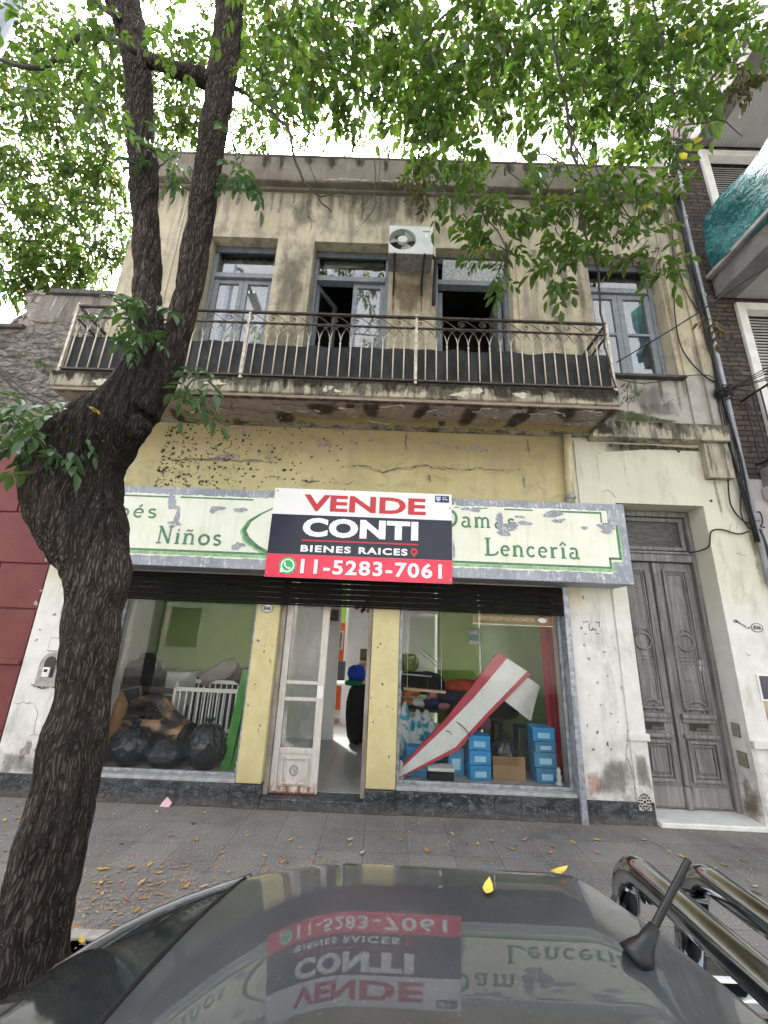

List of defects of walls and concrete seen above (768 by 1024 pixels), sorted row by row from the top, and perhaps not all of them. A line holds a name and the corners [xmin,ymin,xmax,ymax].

leakage [52,370,111,392]
leakage [154,375,699,490]
crack [343,434,529,487]
peeling [168,491,181,526]
peeling [496,512,533,536]
peeling [543,510,566,523]
peeling [581,519,615,534]
leakage [604,764,625,791]
leakage [638,758,649,781]